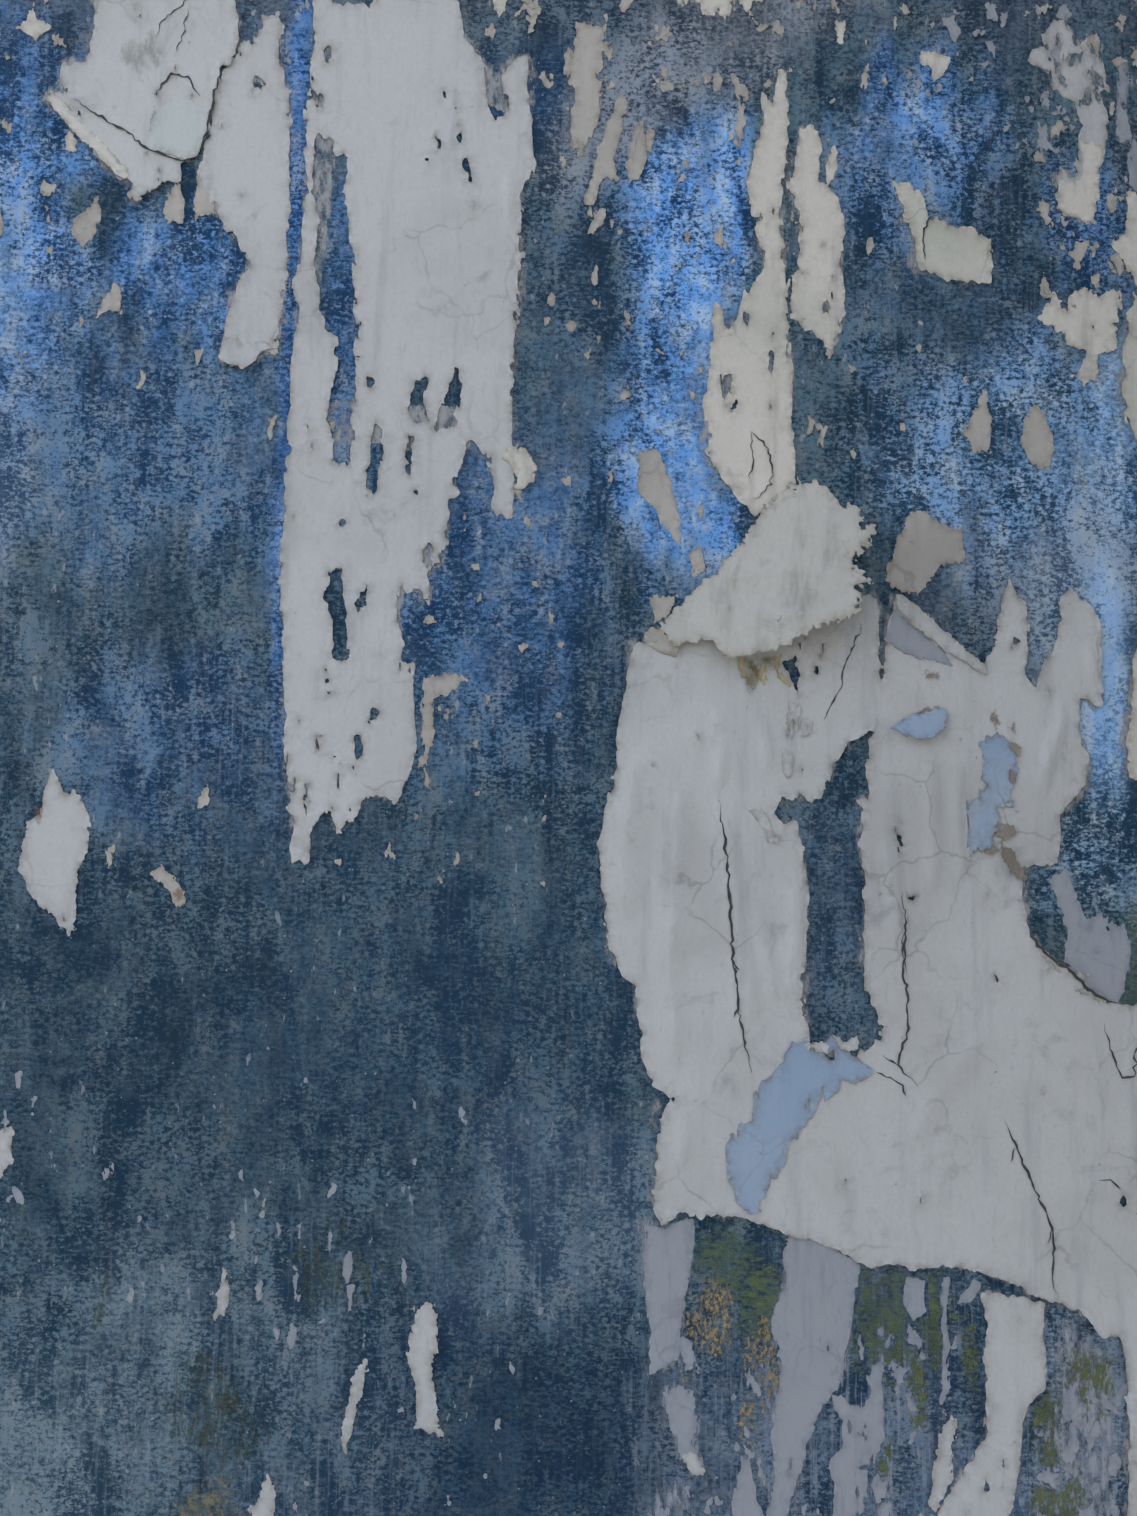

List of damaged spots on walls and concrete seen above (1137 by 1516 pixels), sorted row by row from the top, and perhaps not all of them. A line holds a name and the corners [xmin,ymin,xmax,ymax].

crack [75,0,224,161]
peeling [16,0,655,882]
peeling [596,0,1137,1516]
peeling [18,769,116,936]
peeling [150,864,186,909]
peeling [229,1169,302,1240]
peeling [273,1323,297,1352]
peeling [292,1265,301,1302]
peeling [328,1232,355,1312]
peeling [398,1302,444,1438]
damp [686,1260,781,1445]
crack [1006,1124,1056,1290]